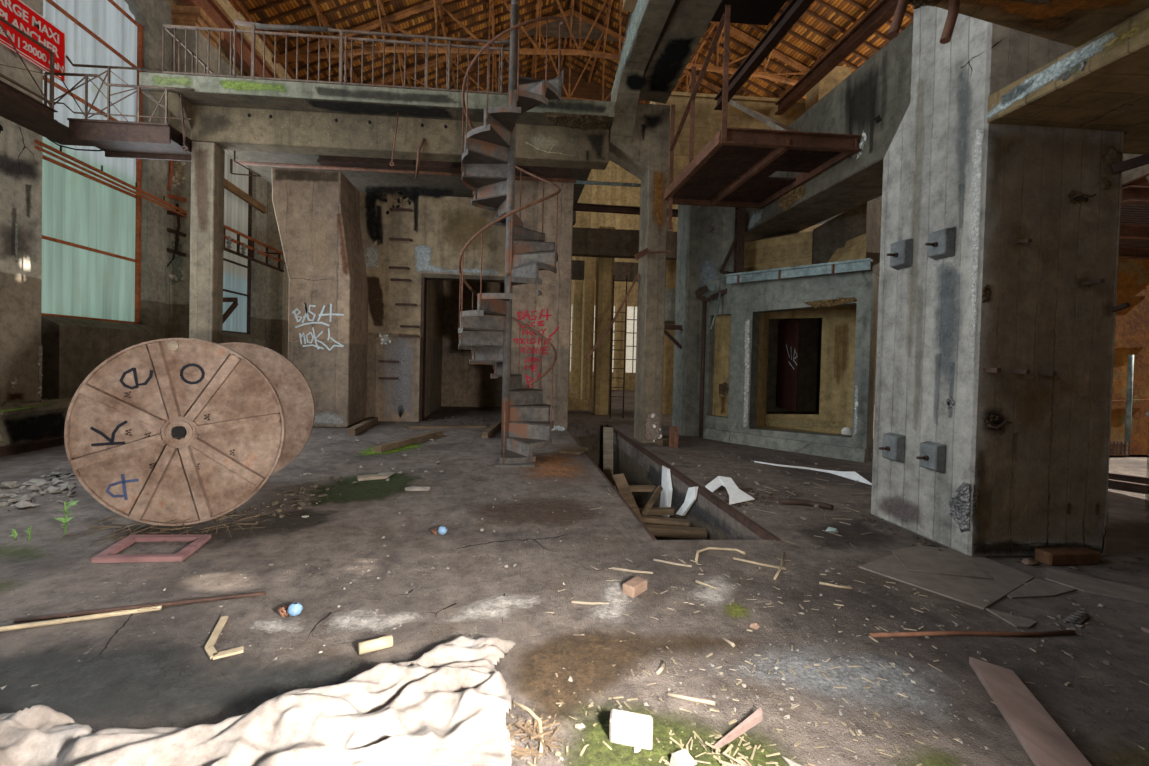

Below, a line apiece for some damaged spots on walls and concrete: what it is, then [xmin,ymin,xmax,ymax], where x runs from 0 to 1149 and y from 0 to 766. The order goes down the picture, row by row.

spalling [908,0,942,9]
corrosion [966,0,1132,21]
flaking render [1053,57,1088,81]
flaking render [1000,80,1034,107]
water stain [958,78,969,209]
water stain [365,186,454,326]
water stain [415,246,498,274]
water stain [939,269,957,417]
spalling [948,482,971,533]